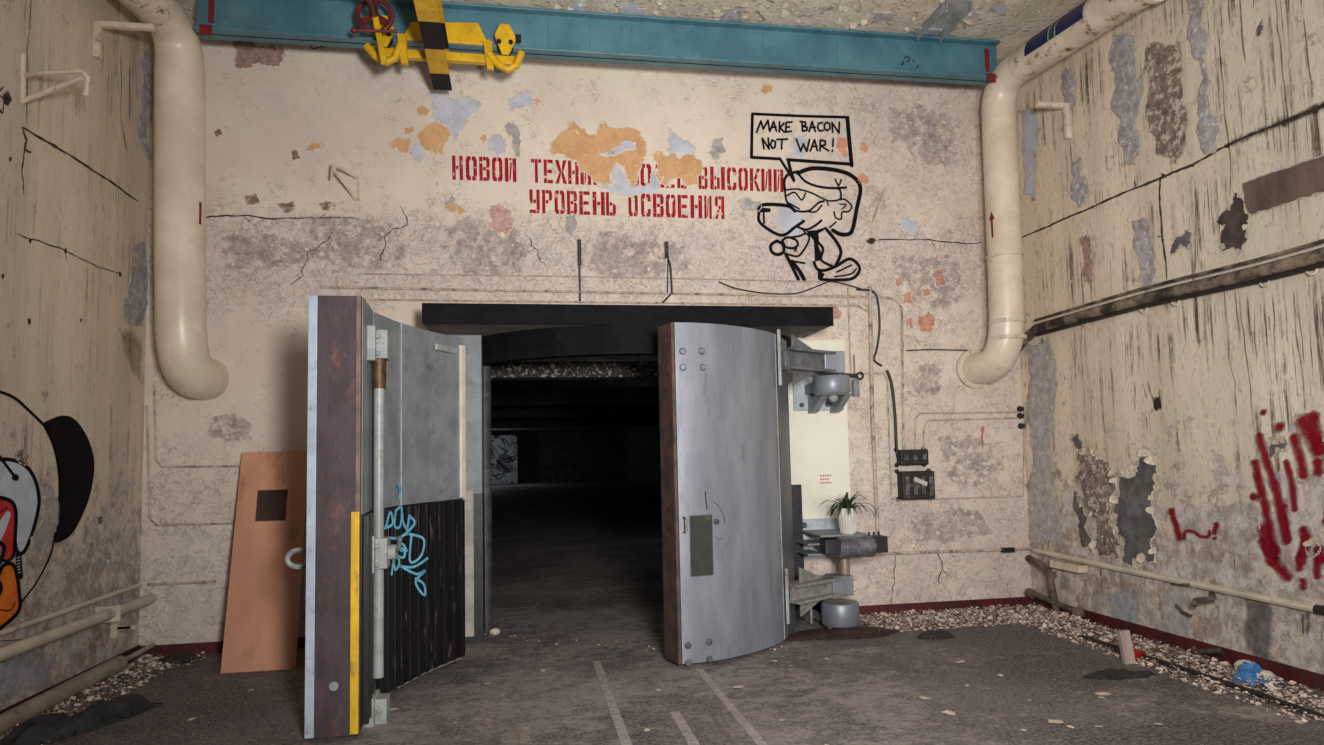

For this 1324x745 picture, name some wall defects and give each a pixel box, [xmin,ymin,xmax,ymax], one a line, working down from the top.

peeling [542,0,592,11]
peeling [607,0,948,32]
peeling [1108,0,1222,167]
peeling [549,120,726,197]
peeling [1024,337,1160,569]